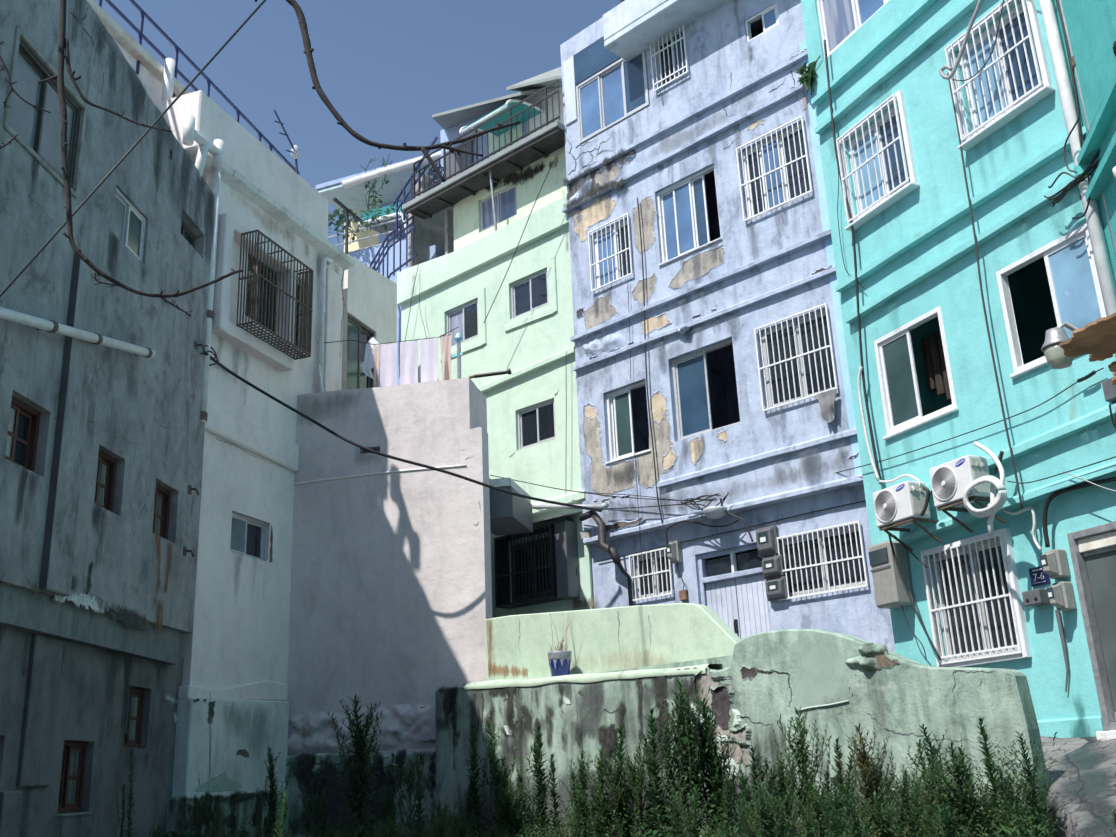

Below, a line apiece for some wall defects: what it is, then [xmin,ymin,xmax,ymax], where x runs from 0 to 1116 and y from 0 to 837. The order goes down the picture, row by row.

damp [132,76,146,119]
damp [173,154,214,244]
crack [568,132,613,175]
peeling [566,148,638,242]
damp [110,234,118,271]
peeling [589,243,726,359]
peeling [583,389,729,502]
rust [156,533,172,633]
damp [438,675,775,837]
crack [604,618,792,742]
spalling [689,665,773,782]
spalling [845,643,901,671]